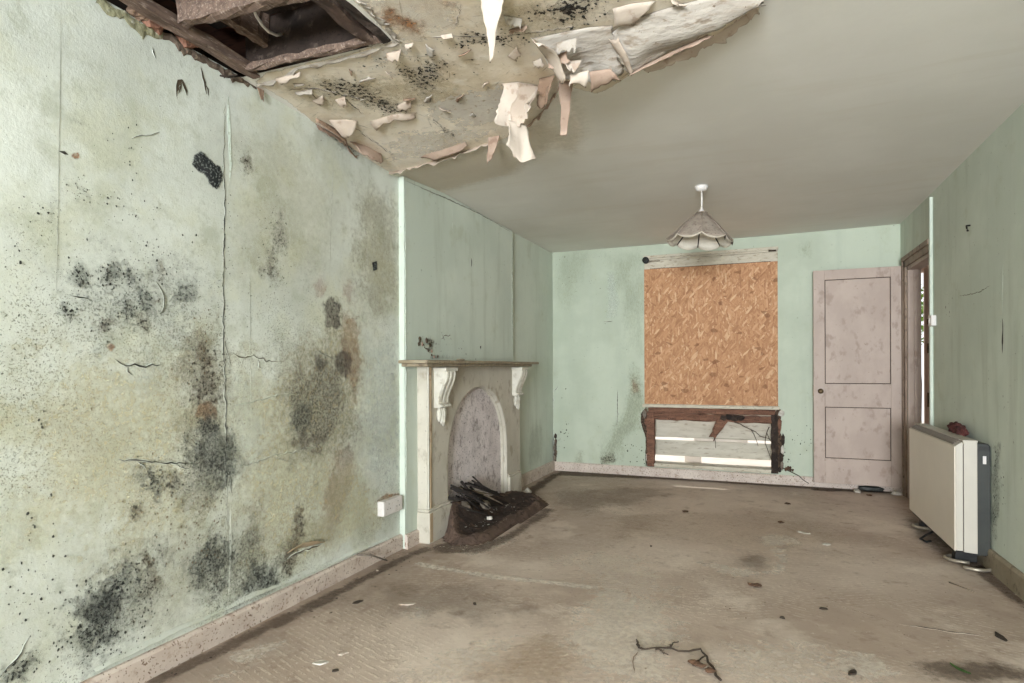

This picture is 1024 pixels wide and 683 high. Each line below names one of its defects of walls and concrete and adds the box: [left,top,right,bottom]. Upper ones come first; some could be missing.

peeling [503,15,527,34]
peeling [613,1,655,28]
flaking render [96,0,257,96]
peeling [367,38,434,64]
damp [358,48,455,93]
peeling [275,72,357,139]
damp [308,79,411,116]
peeling [370,82,504,131]
damp [192,152,223,189]
crack [114,102,316,535]
damp [0,204,361,683]